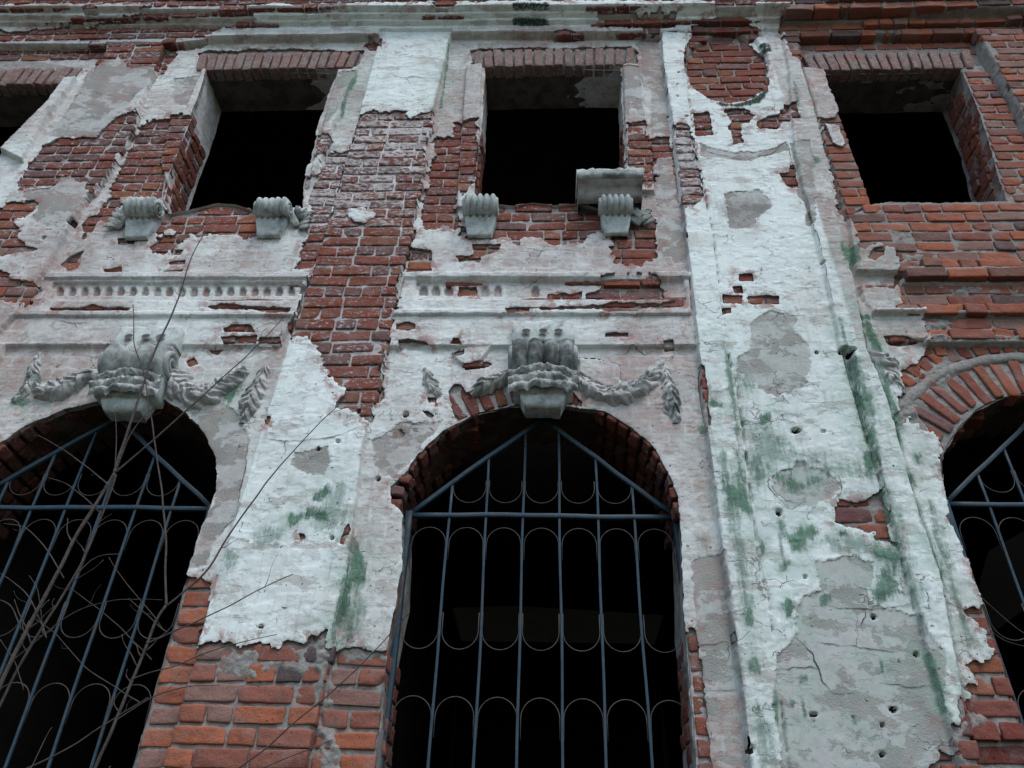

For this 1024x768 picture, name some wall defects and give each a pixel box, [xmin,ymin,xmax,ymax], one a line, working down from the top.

flaking render [0,0,1024,429]
spalling [135,402,390,768]
flaking render [771,460,898,547]
crack [781,603,910,694]